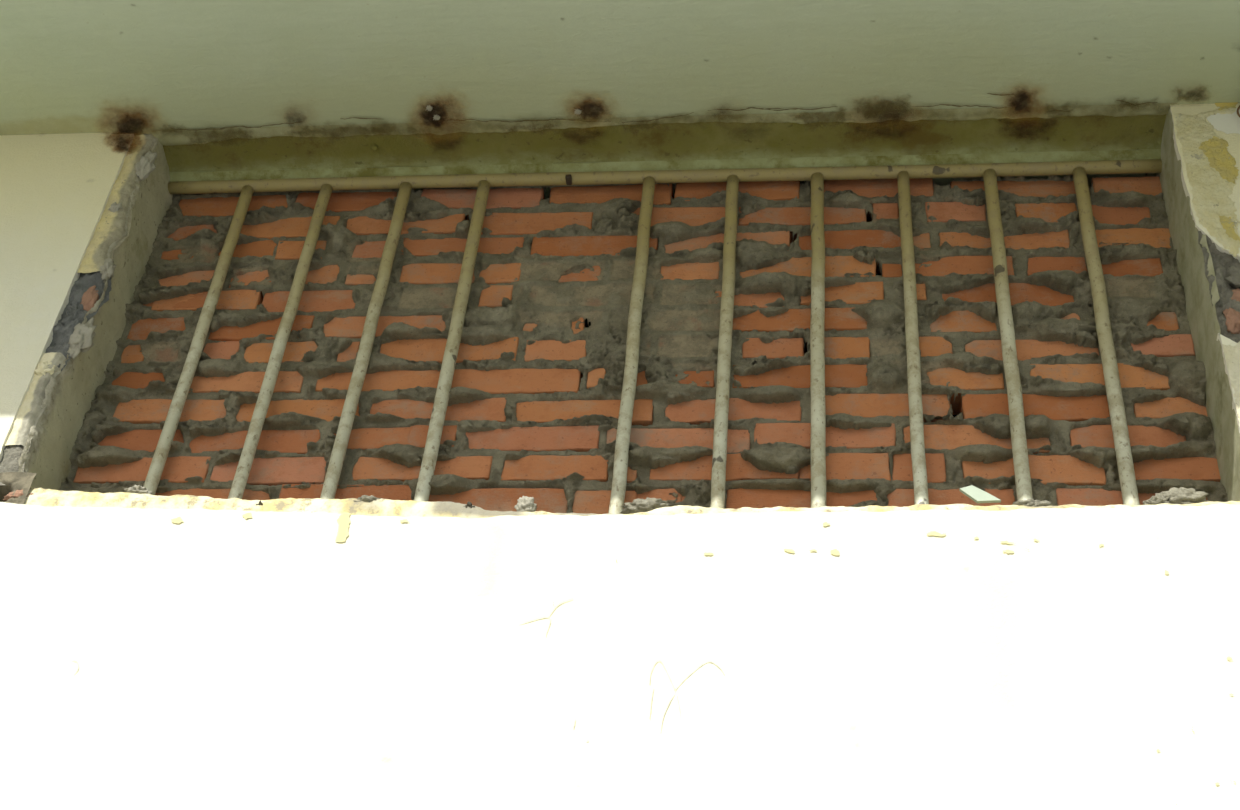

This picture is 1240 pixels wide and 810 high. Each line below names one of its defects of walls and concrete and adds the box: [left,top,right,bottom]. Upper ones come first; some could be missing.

corrosion [104,110,152,151]
corrosion [421,100,460,148]
corrosion [565,99,603,142]
corrosion [1006,92,1055,137]
spalling [0,102,1240,542]